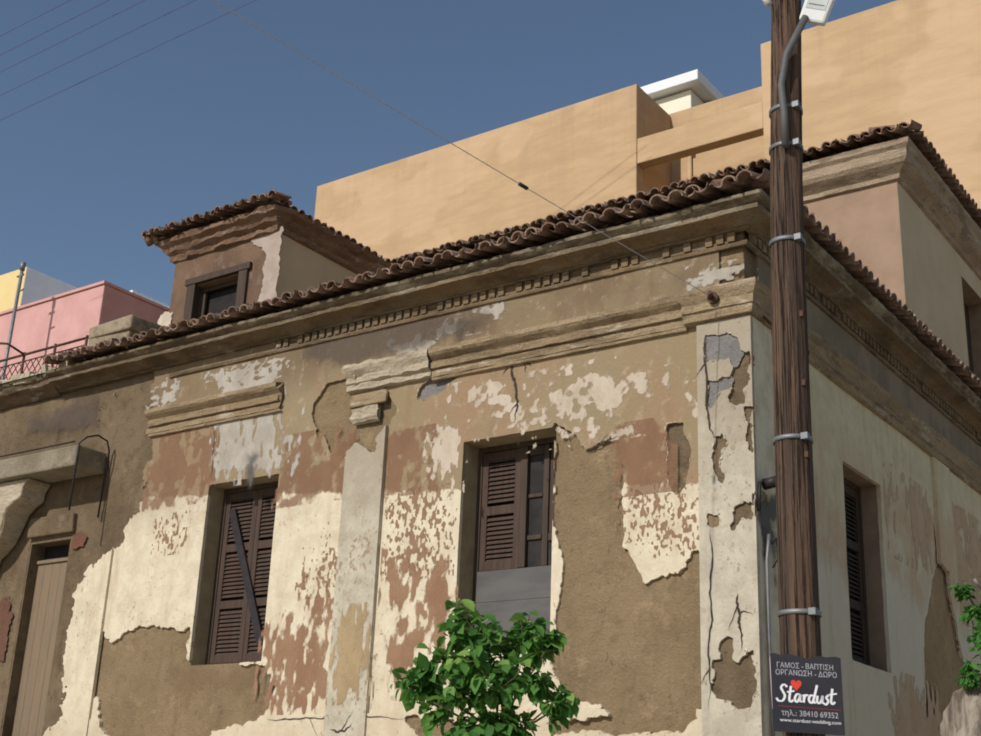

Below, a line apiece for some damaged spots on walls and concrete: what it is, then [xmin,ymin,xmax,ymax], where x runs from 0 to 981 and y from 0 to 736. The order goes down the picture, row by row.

peeling [685,259,744,291]
crack [503,363,531,422]
crack [696,338,714,436]
flaking render [683,332,756,418]
flaking render [0,357,757,736]
flaking render [731,490,768,531]
crack [697,539,752,704]
flaking render [888,503,981,736]